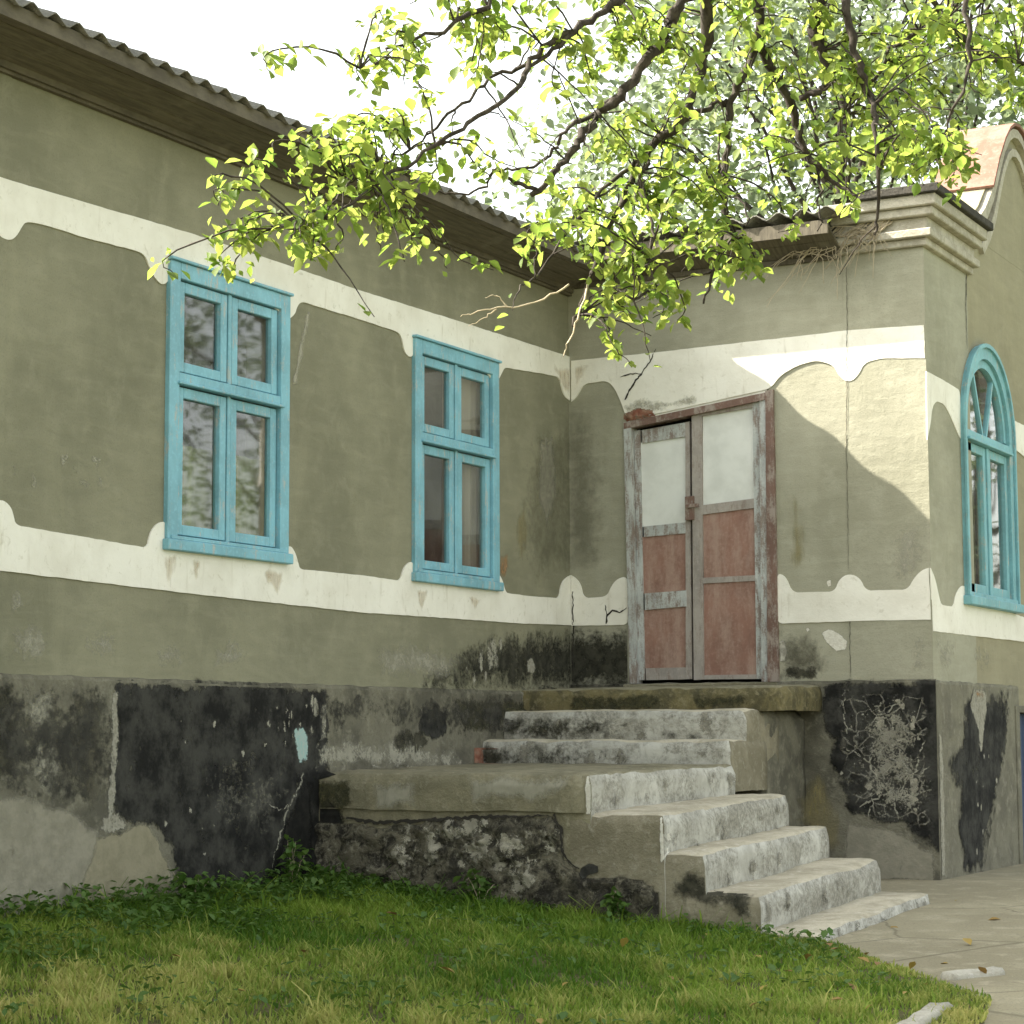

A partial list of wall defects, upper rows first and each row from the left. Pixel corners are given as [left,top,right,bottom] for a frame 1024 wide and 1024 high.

crack [569,591,577,681]
crack [605,605,626,624]
peeling [822,629,847,651]
crack [270,774,304,868]
water stain [0,630,658,891]
crack [842,621,929,819]
water stain [950,690,1009,873]